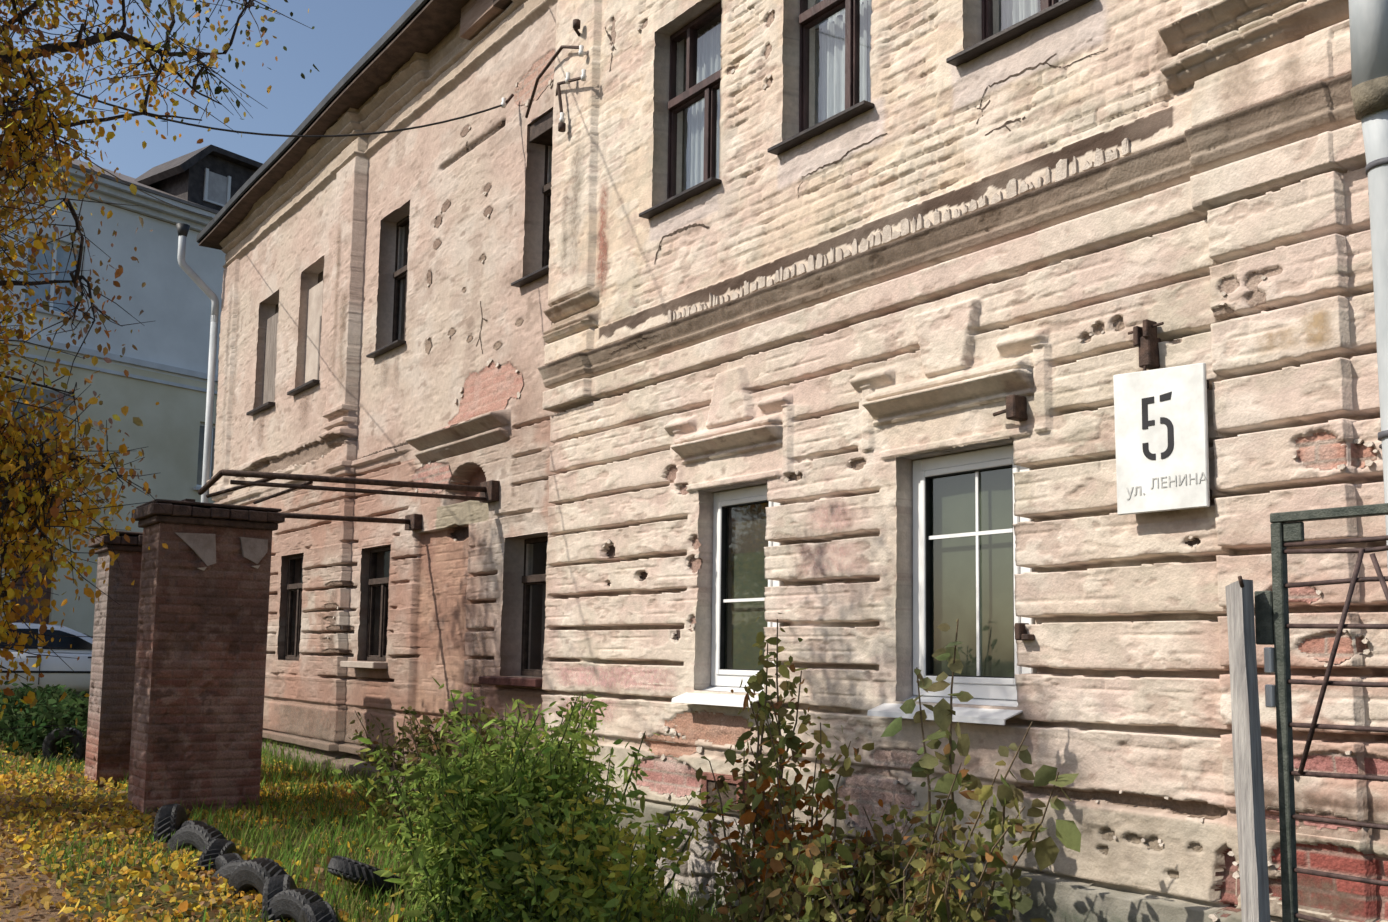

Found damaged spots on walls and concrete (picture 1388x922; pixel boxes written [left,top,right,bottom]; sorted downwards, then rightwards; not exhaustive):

crack [976,48,1108,136]
crack [798,133,887,198]
crack [654,223,709,264]
spalling [1212,267,1282,321]
flaking render [443,341,523,428]
flaking render [1292,432,1379,470]
flaking render [666,465,689,495]
spalling [602,540,627,561]
flaking render [686,535,702,573]
flaking render [1298,630,1371,667]
flaking render [1293,751,1388,780]
flaking render [1265,809,1388,922]